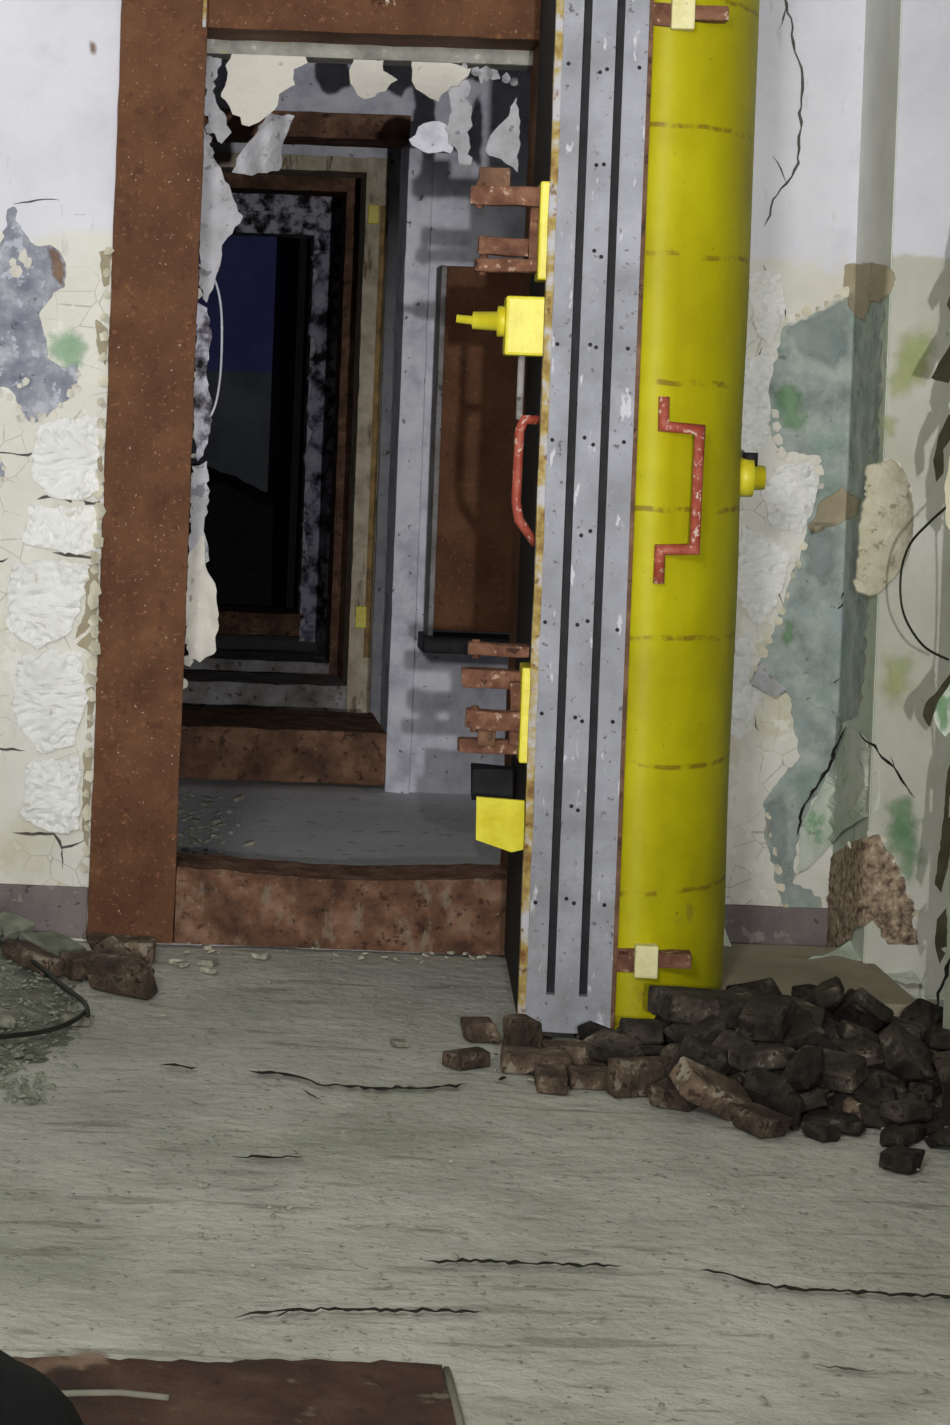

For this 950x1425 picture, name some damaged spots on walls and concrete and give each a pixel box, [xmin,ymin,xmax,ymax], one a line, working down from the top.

peeling [349,59,521,173]
crack [764,0,804,226]
peeling [933,402,950,530]
peeling [0,207,115,873]
peeling [731,262,921,947]
peeling [923,675,950,736]
crack [859,732,915,798]
peeling [935,765,950,892]
crack [247,1070,466,1100]
crack [235,1307,481,1318]
crack [428,1258,619,1267]
crack [703,1269,950,1299]